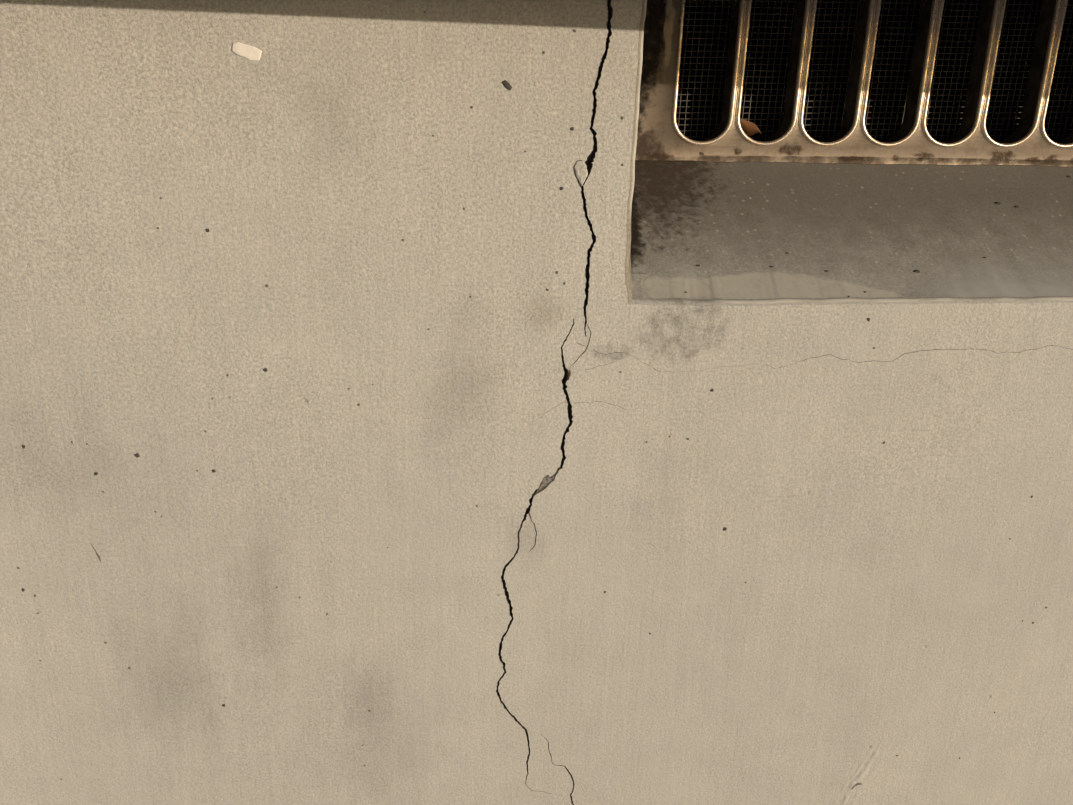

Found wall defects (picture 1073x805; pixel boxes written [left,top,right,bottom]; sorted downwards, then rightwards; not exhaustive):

leakage [637,0,667,133]
leakage [631,160,713,265]
leakage [644,272,897,299]
crack [496,0,1073,805]